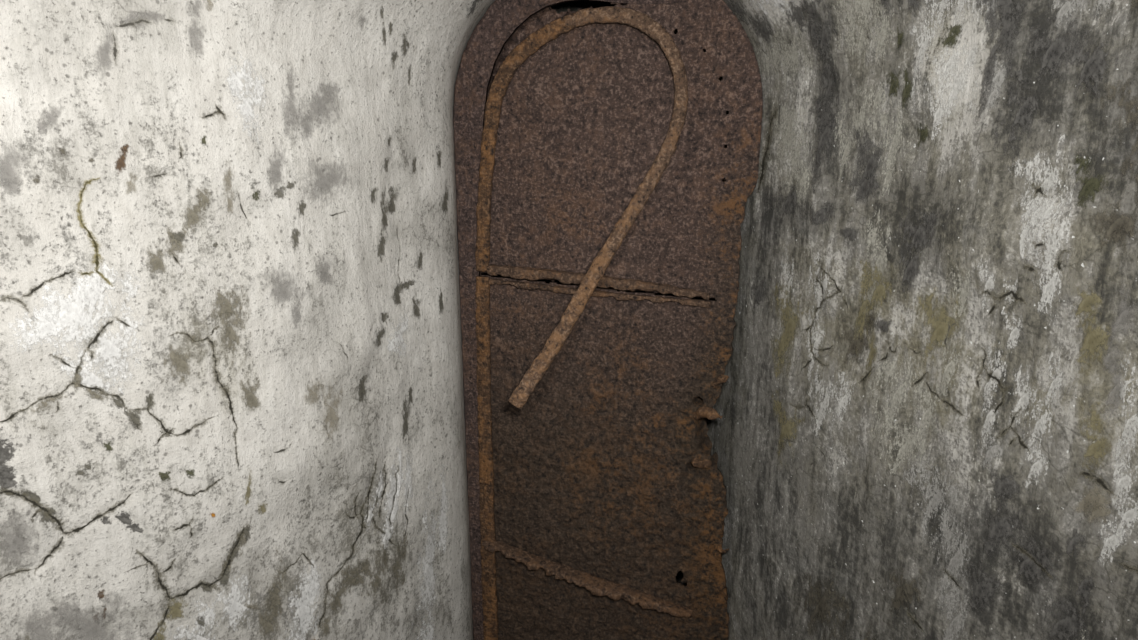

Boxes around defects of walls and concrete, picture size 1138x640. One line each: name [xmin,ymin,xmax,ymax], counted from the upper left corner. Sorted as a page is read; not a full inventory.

crack [0,178,113,311]
damp [759,0,860,242]
crack [801,268,848,371]
damp [849,128,881,203]
damp [843,209,959,375]
damp [977,0,1138,249]
crack [0,489,131,580]
crack [0,319,239,536]
crack [133,527,244,640]
crack [283,461,409,628]
rust [692,406,723,420]
damp [965,350,1122,640]